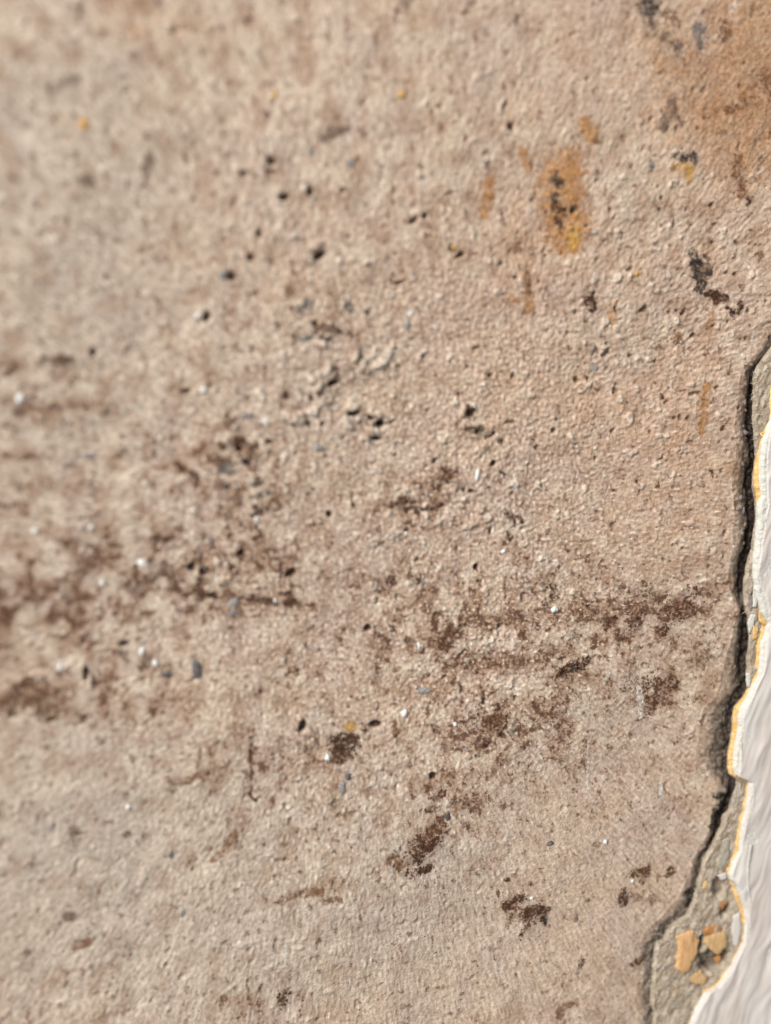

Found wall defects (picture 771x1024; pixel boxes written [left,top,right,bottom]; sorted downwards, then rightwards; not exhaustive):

rust [518,116,602,261]